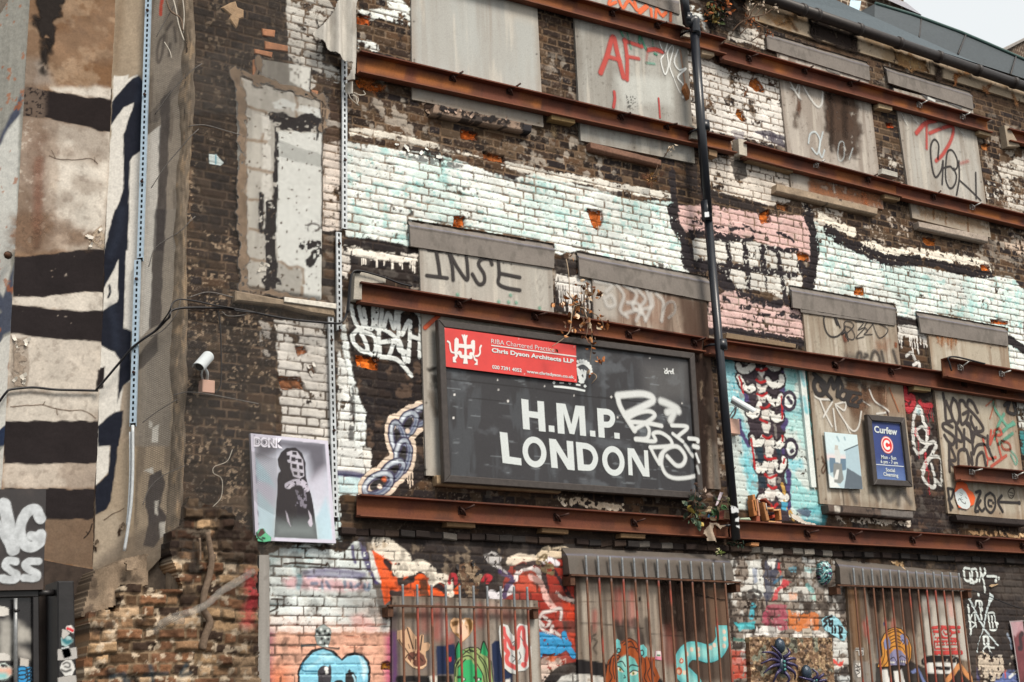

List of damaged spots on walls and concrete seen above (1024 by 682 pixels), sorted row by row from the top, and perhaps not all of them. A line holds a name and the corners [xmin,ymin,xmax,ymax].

peeling [395,143,444,161]
spalling [453,216,465,228]
spalling [587,208,603,230]